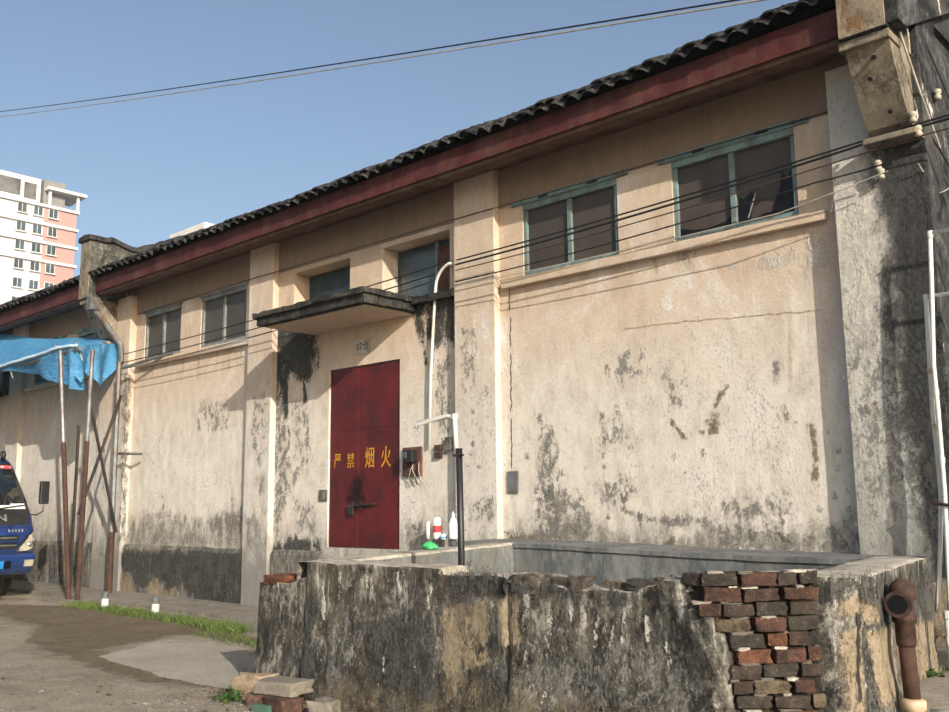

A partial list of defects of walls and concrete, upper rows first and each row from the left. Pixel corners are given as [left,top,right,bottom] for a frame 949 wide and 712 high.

damp [908,32,934,125]
damp [117,330,321,604]
damp [413,299,489,456]
damp [511,414,607,542]
peeling [698,385,729,436]
damp [594,139,949,712]
damp [297,563,706,712]